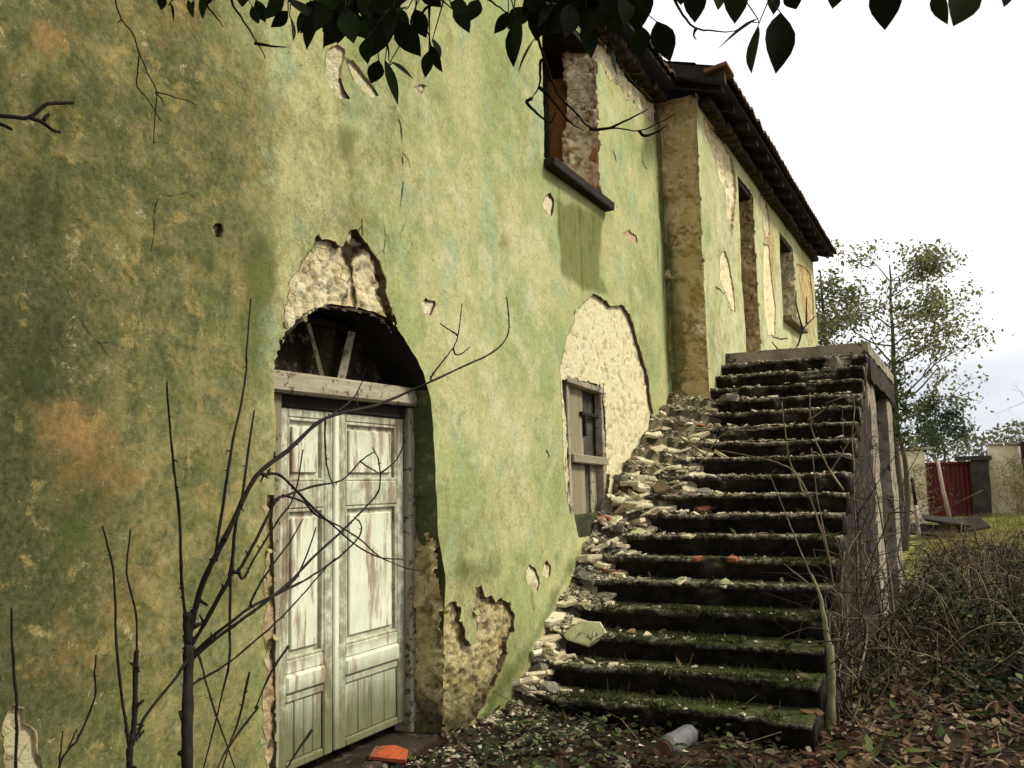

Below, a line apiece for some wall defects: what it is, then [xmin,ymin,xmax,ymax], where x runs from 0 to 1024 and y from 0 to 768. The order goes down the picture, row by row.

flaking render [325,44,378,99]
flaking render [543,193,554,216]
flaking render [562,40,814,399]
flaking render [279,229,397,340]
flaking render [421,298,436,315]
flaking render [560,293,654,514]
flaking render [526,560,551,590]
flaking render [413,532,515,737]
flaking render [2,703,42,768]